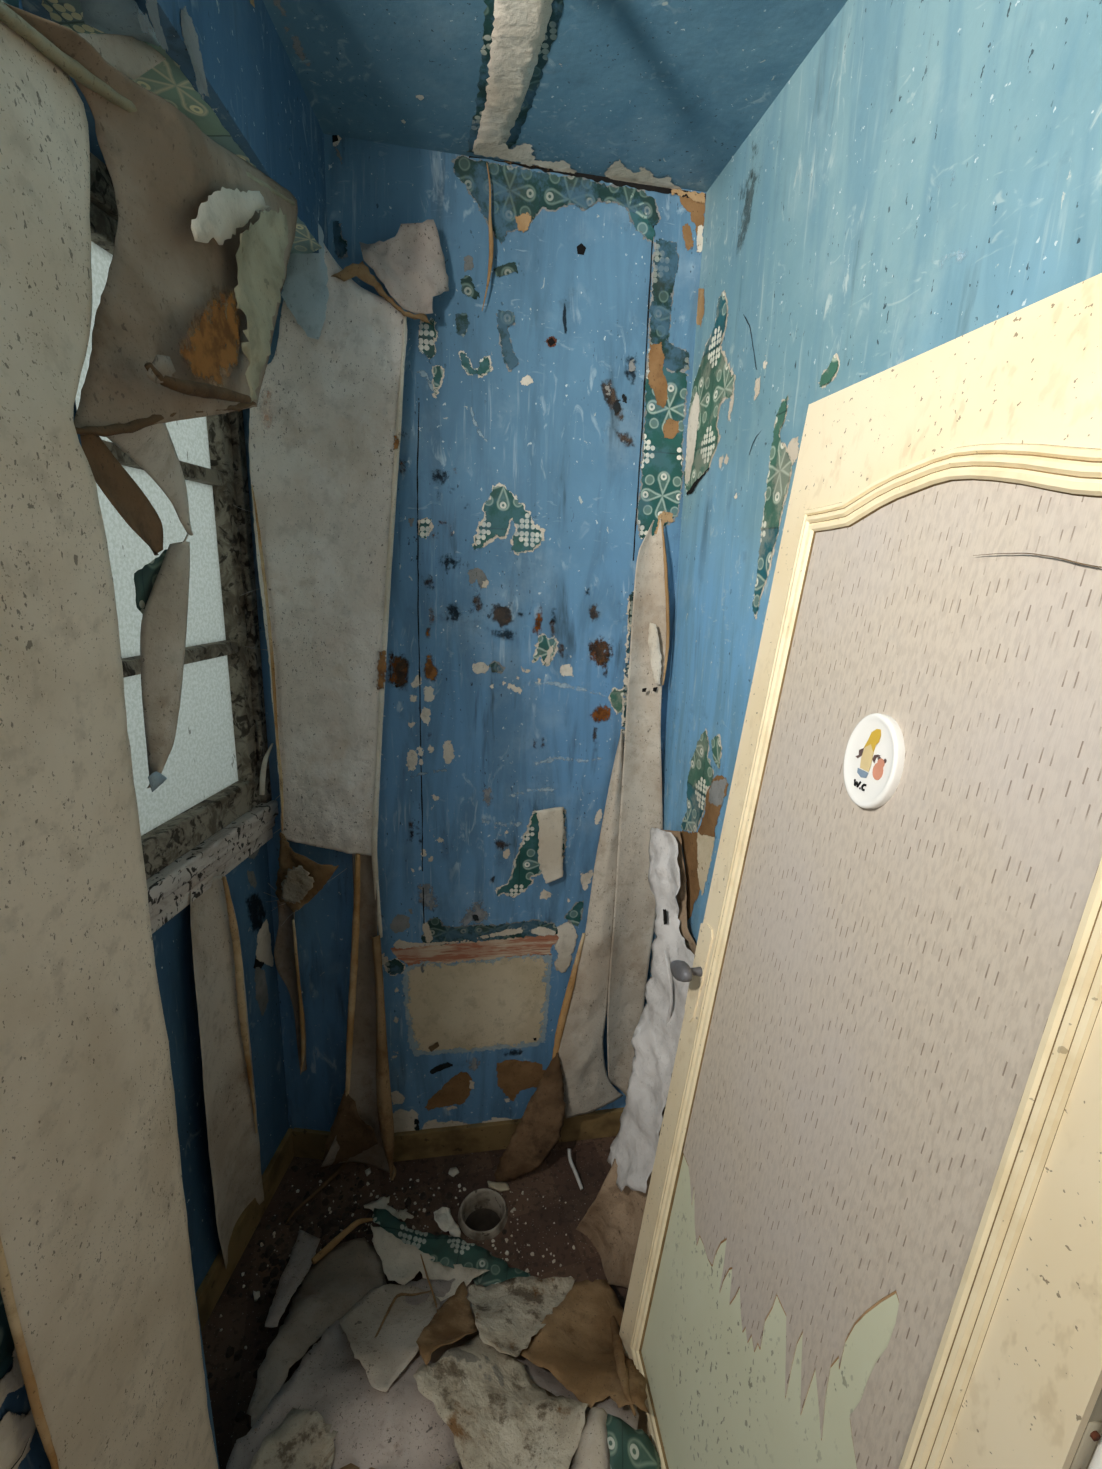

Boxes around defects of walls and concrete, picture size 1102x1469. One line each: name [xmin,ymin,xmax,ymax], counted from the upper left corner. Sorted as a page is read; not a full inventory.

peeling [135,0,210,100]
peeling [418,310,533,394]
peeling [451,155,736,539]
peeling [418,517,434,539]
peeling [472,482,545,555]
peeling [752,395,799,619]
peeling [408,673,435,728]
peeling [472,633,574,694]
peeling [608,591,634,750]
peeling [259,743,273,795]
peeling [406,740,455,771]
flaking render [382,810,593,1133]